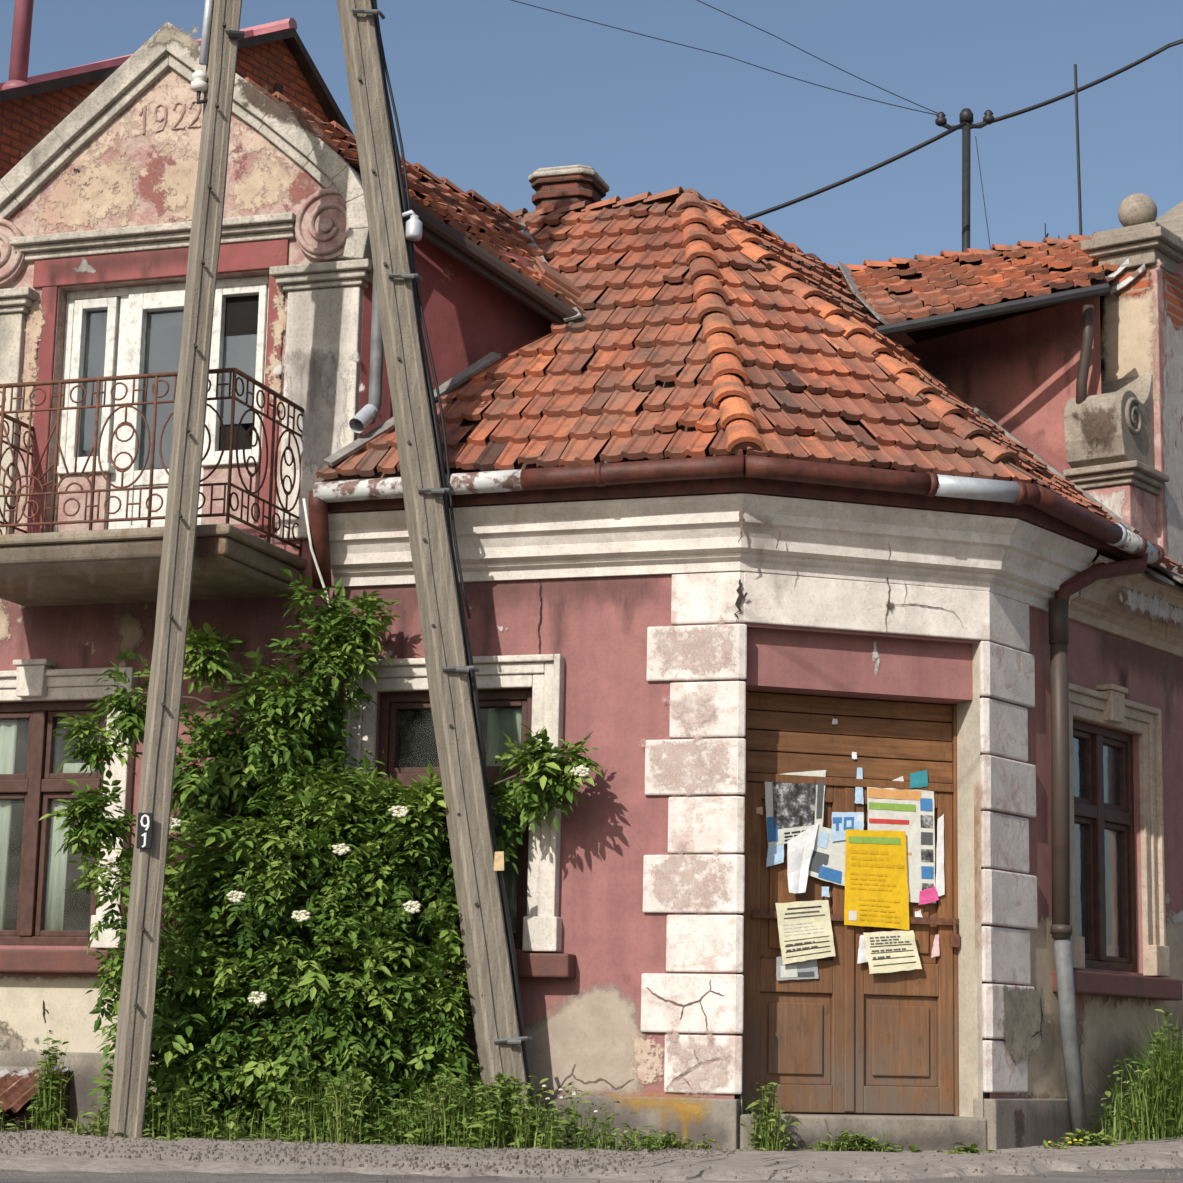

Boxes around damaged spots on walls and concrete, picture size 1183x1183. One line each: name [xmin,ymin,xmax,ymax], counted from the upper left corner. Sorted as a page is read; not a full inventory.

peeling [11,68,204,233]
peeling [226,79,333,217]
peeling [1101,259,1183,580]
flaking render [0,598,25,645]
crack [734,579,748,622]
crack [885,542,963,632]
flaking render [0,976,118,1053]
crack [558,1064,634,1089]
flaking render [524,985,731,1097]
crack [646,980,724,1089]
flaking render [998,916,1068,1148]
flaking render [1079,893,1183,1095]